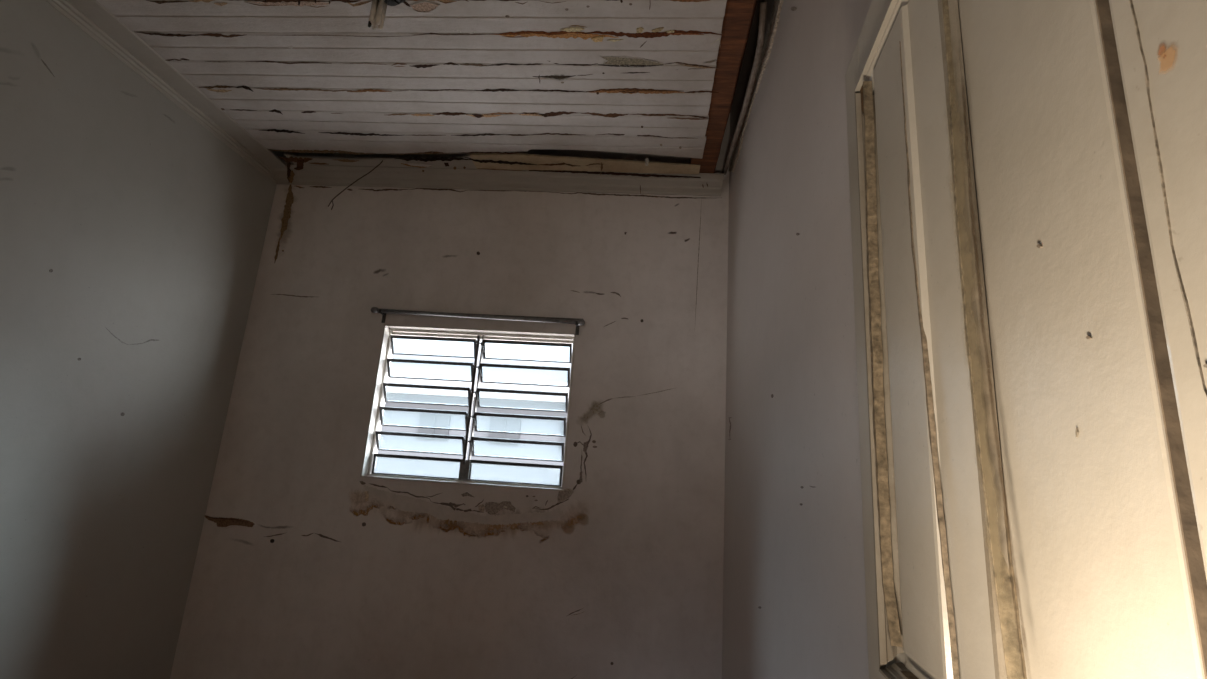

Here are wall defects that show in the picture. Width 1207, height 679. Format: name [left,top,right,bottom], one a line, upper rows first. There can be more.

peeling [146,0,372,8]
peeling [245,0,723,70]
crack [1129,0,1207,396]
crack [532,388,674,510]
flaking render [205,515,256,529]
water stain [351,504,526,536]